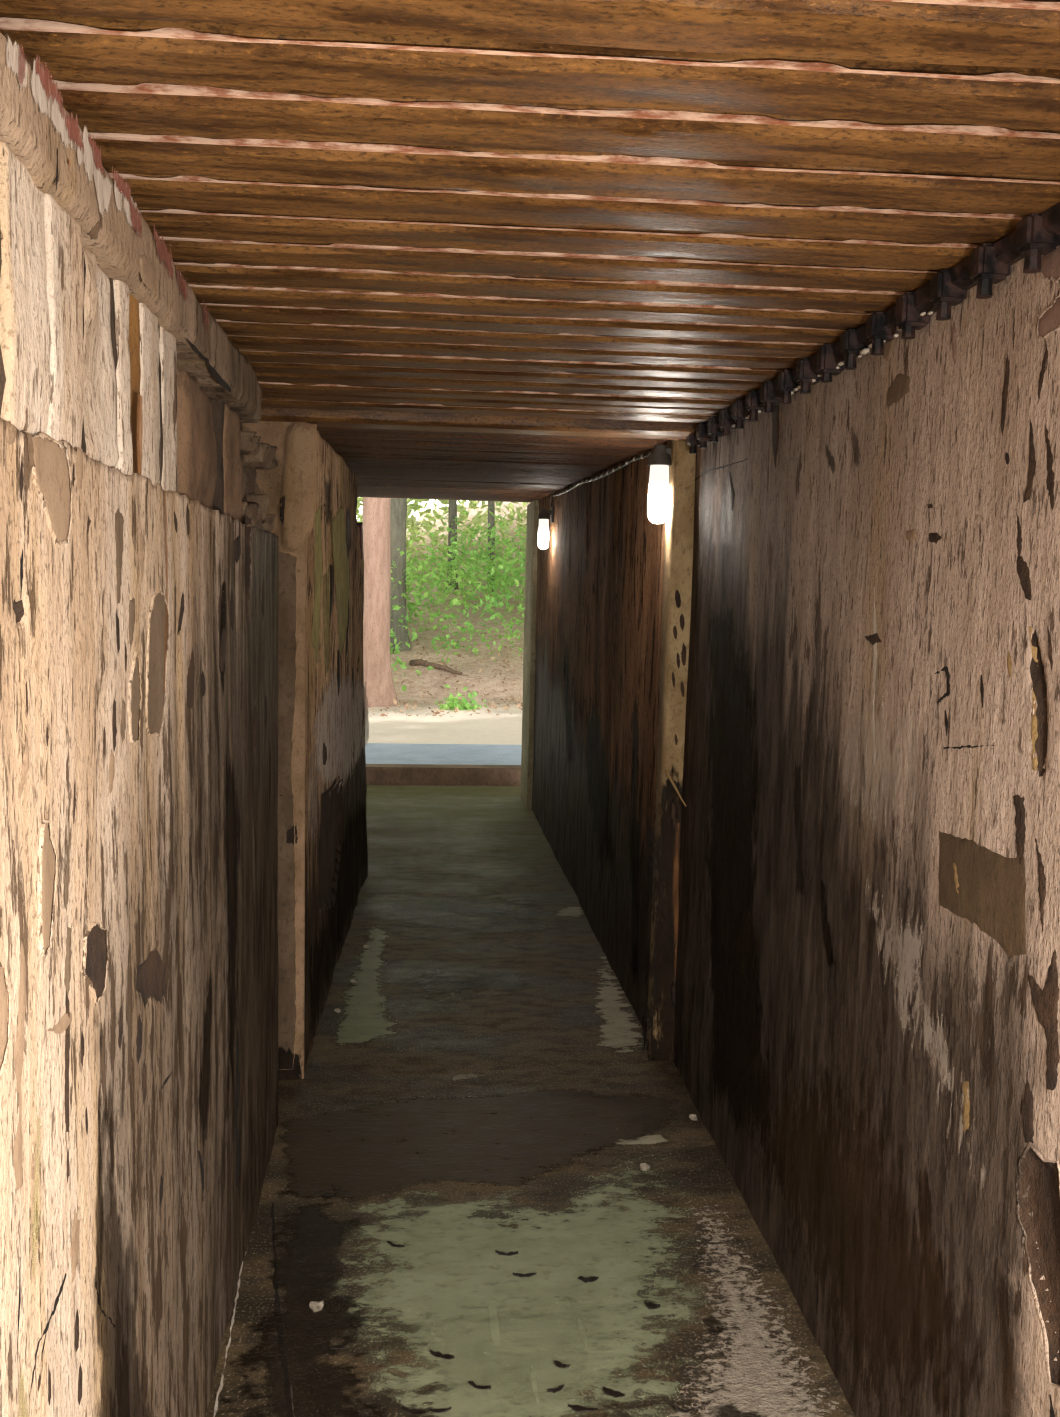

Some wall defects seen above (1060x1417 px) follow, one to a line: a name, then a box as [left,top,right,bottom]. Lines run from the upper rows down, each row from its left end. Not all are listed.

peeling [7,37,141,237]
peeling [8,429,91,549]
peeling [103,490,190,794]
damp [731,326,902,473]
peeling [0,778,109,1190]
damp [96,1085,150,1417]
spalling [118,949,167,1102]
damp [199,756,240,1144]
damp [214,1089,698,1417]
damp [706,605,984,1417]
peeling [939,795,1046,957]
spalling [1016,949,1060,1388]